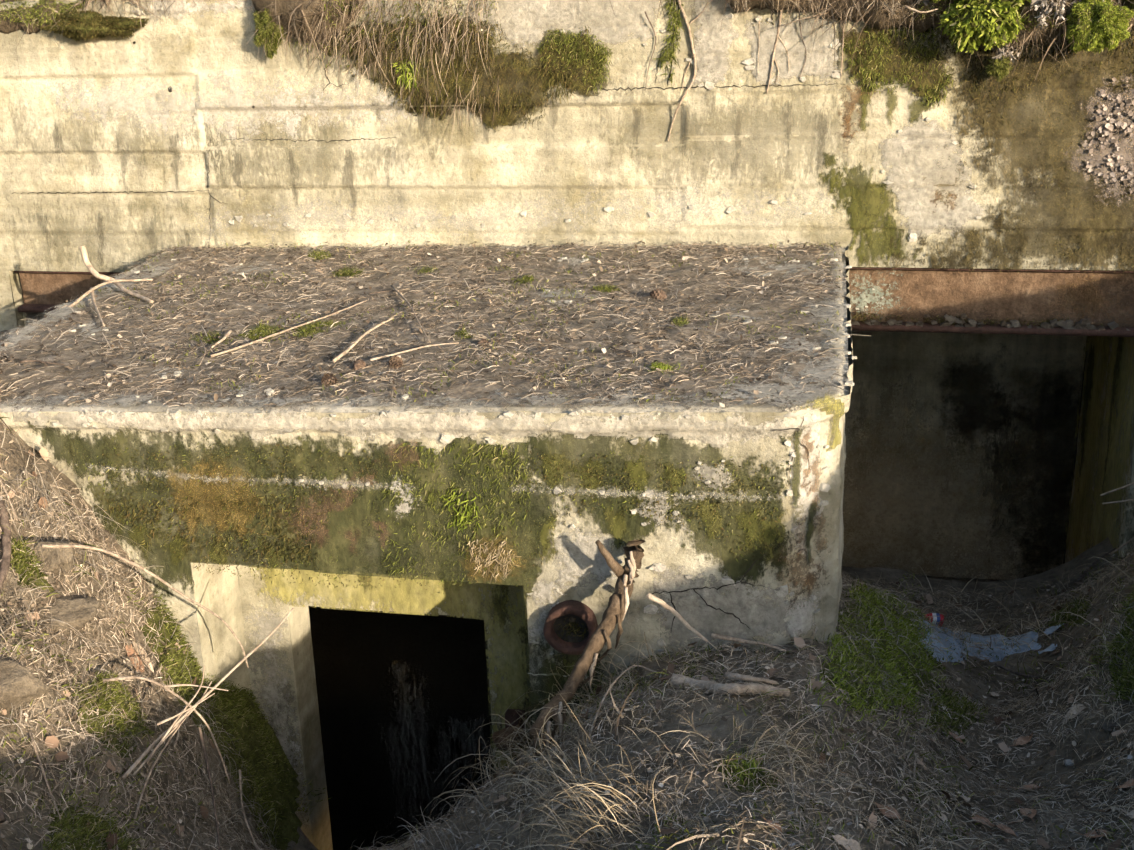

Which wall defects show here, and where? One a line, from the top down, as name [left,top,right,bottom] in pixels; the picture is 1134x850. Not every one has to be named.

leakage [46,69,417,144]
leakage [823,153,840,193]
leakage [846,27,1134,275]
leakage [64,437,123,486]
leakage [102,442,272,568]
leakage [284,446,371,495]
leakage [389,479,415,514]
leakage [842,345,1094,580]
crack [652,557,765,631]